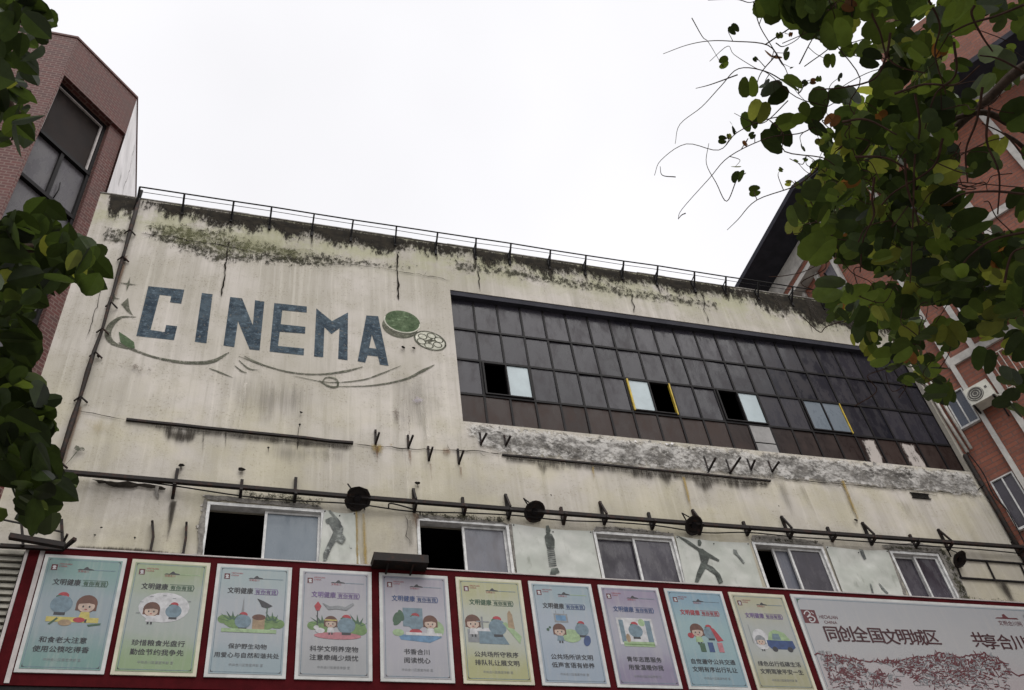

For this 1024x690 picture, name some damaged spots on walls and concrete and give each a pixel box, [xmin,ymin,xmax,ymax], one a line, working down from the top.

crack [148,234,298,296]
crack [325,254,440,299]
water stain [103,195,854,331]
water stain [478,429,975,494]